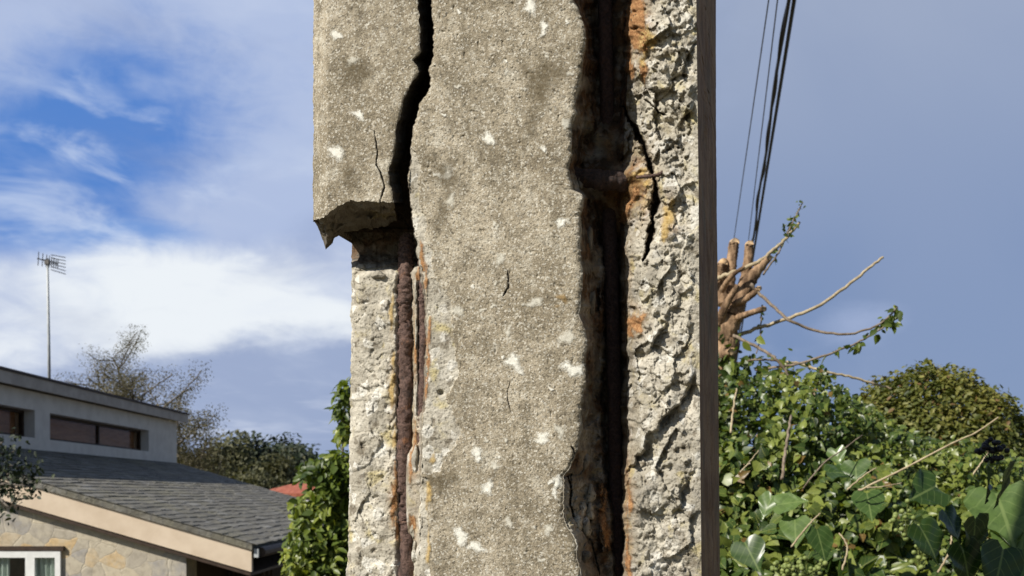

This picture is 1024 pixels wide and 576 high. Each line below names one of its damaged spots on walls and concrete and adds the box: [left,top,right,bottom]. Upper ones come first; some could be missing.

corrosion [620,0,657,81]
crack [353,0,435,232]
corrosion [611,168,649,236]
crack [623,99,666,261]
spalling [346,148,461,576]
corrosion [414,317,431,399]
spalling [562,0,701,576]
corrosion [625,313,646,337]
corrosion [390,421,417,540]
corrosion [624,535,632,576]